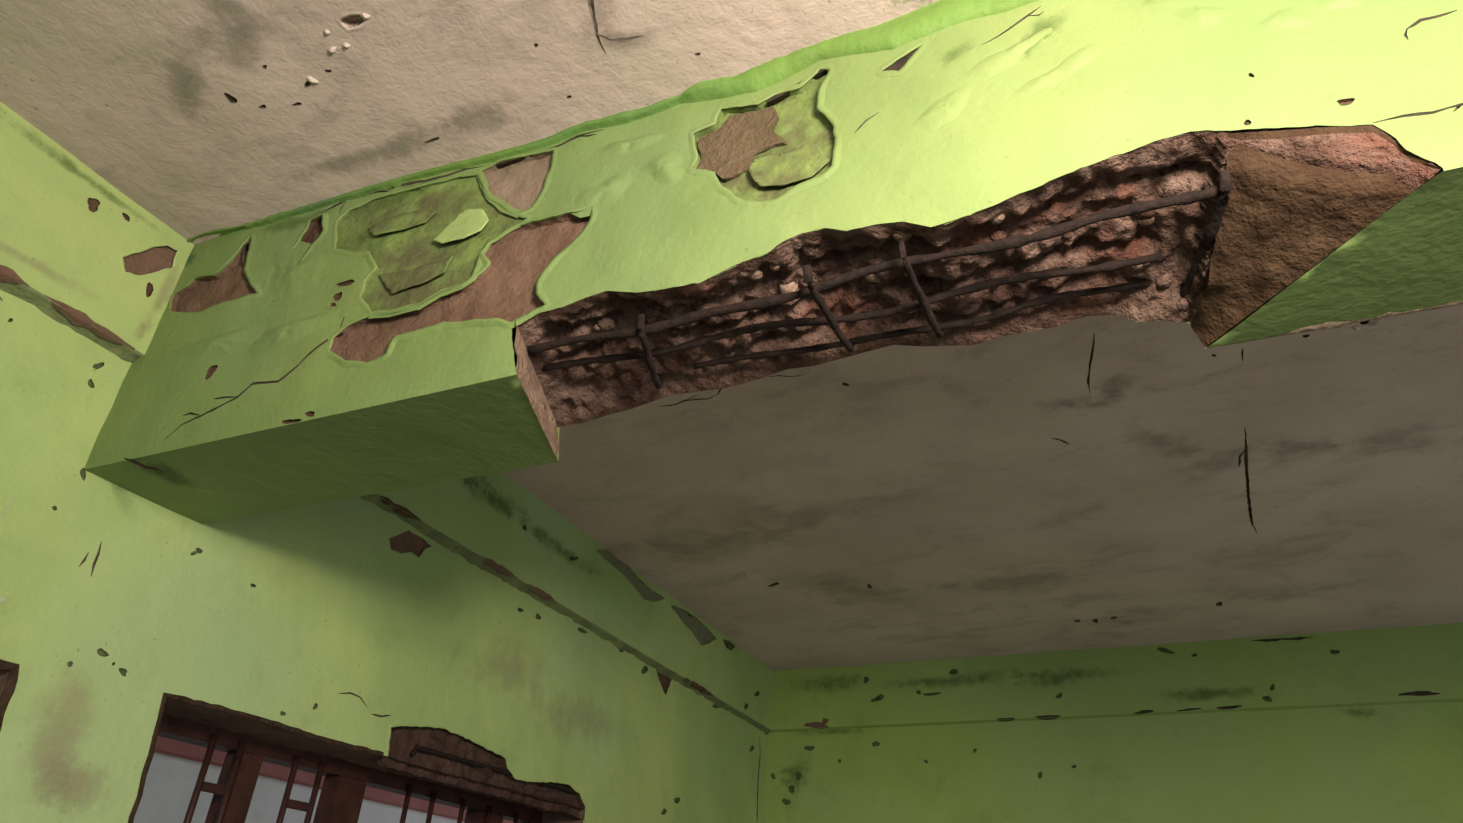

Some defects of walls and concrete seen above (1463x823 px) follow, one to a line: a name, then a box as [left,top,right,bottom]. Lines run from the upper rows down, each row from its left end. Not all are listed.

crack [588,0,643,54]
peeling [686,63,843,207]
crack [1373,103,1463,123]
spalling [87,197,100,212]
peeling [119,231,274,318]
spalling [291,120,1463,460]
crack [125,314,345,472]
spalling [282,411,315,424]
crack [1238,428,1257,533]
spalling [0,659,20,731]
spalling [128,692,587,823]